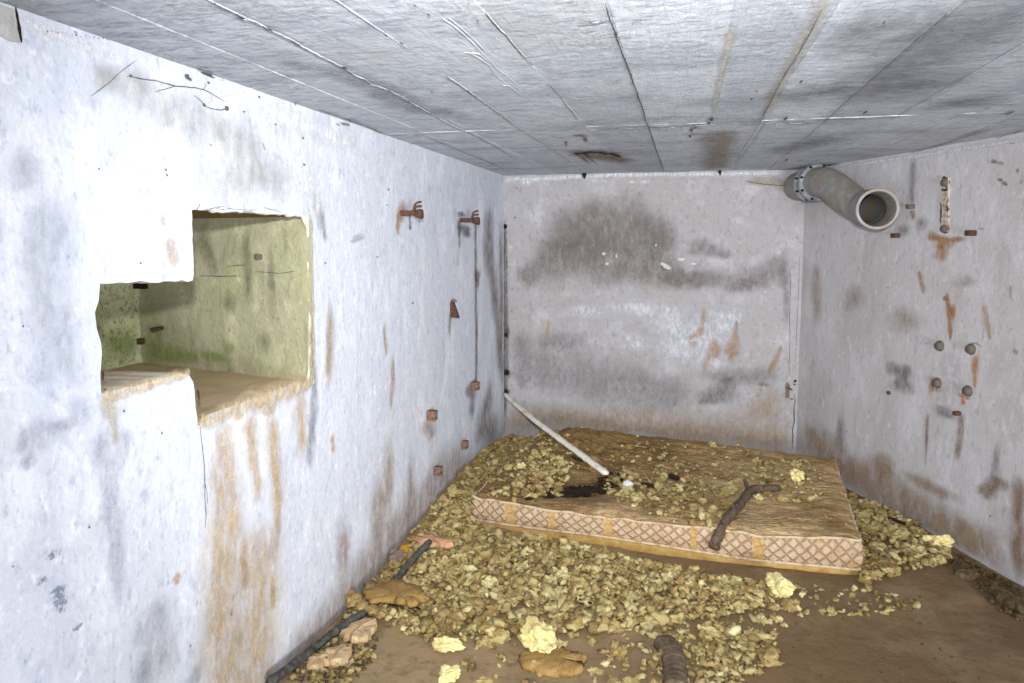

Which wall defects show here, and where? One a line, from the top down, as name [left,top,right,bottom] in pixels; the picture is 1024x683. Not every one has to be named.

water stain [523,206,707,284]
corrosion [929,235,961,258]
corrosion [943,295,955,339]
crack [200,428,208,527]
water stain [271,428,281,527]
water stain [210,447,236,640]
water stain [243,548,274,683]